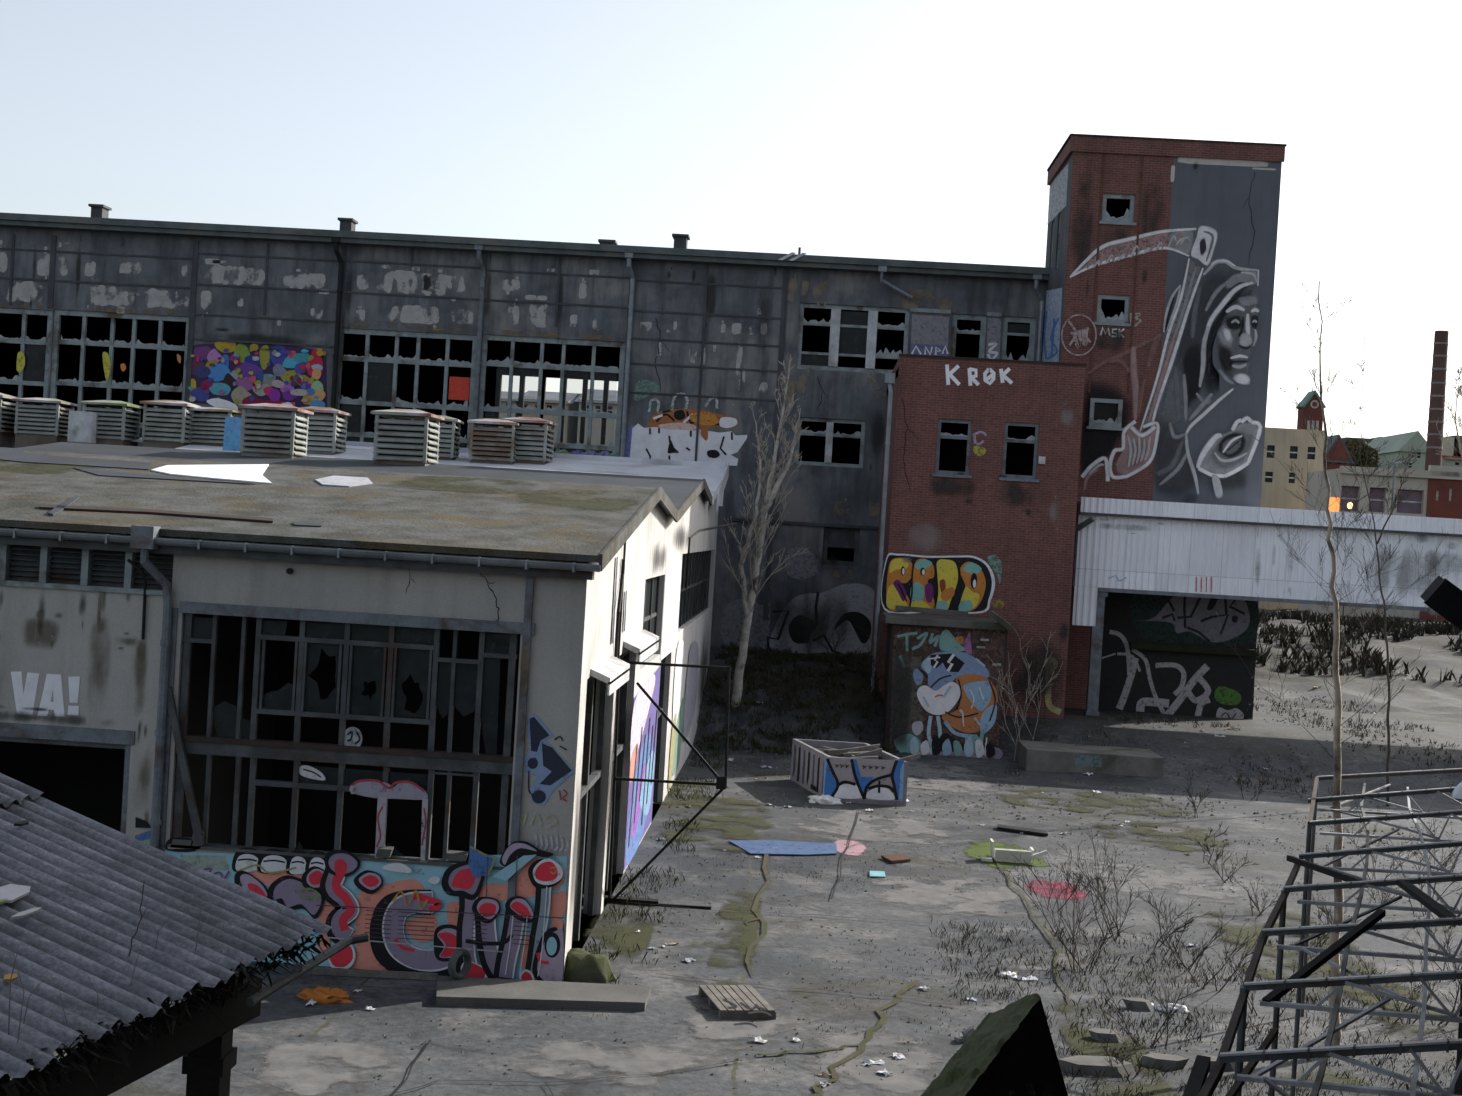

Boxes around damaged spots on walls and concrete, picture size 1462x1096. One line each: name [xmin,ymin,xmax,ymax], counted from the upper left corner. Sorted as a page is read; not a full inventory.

peeling [0,240,265,317]
peeling [283,269,329,319]
peeling [356,265,474,329]
peeling [502,277,548,328]
peeling [570,269,599,328]
water stain [26,605,60,644]
water stain [81,592,105,630]
crack [480,573,499,620]
water stain [119,633,145,685]
water stain [0,708,81,723]